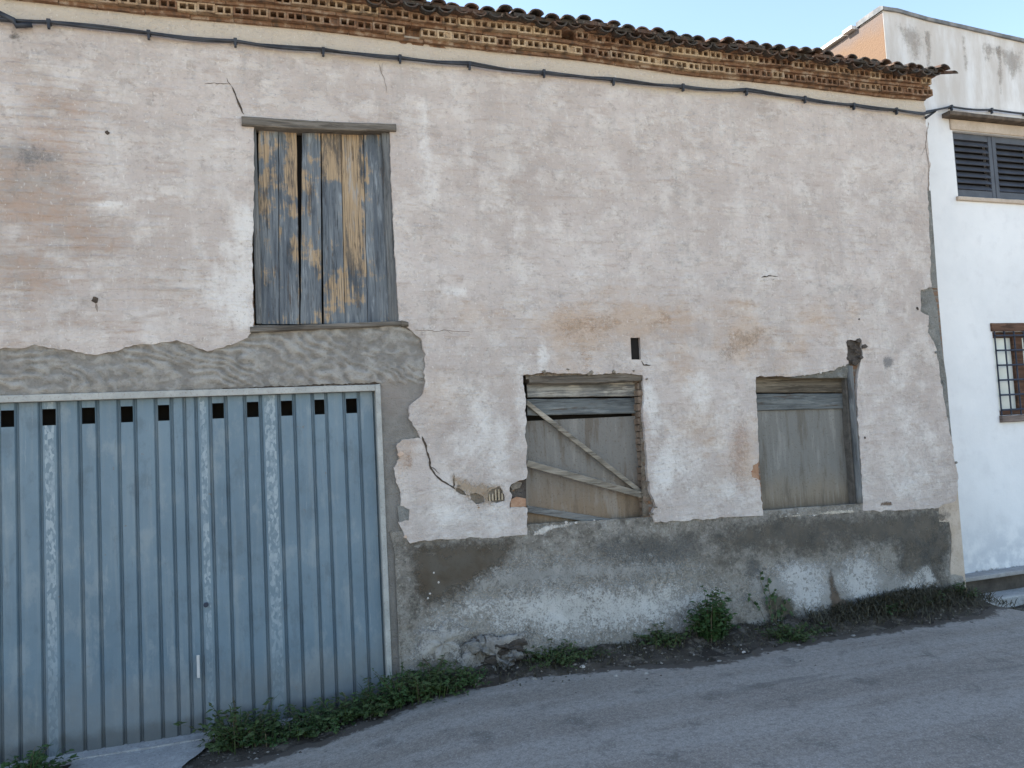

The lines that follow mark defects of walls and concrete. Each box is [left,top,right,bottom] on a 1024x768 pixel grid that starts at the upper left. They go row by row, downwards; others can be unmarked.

crack [205,80,244,114]
peeling [916,191,952,437]
crack [422,437,455,489]
flaking render [456,479,526,508]
peeling [397,505,410,522]
peeling [533,521,577,535]
damp [411,537,731,666]